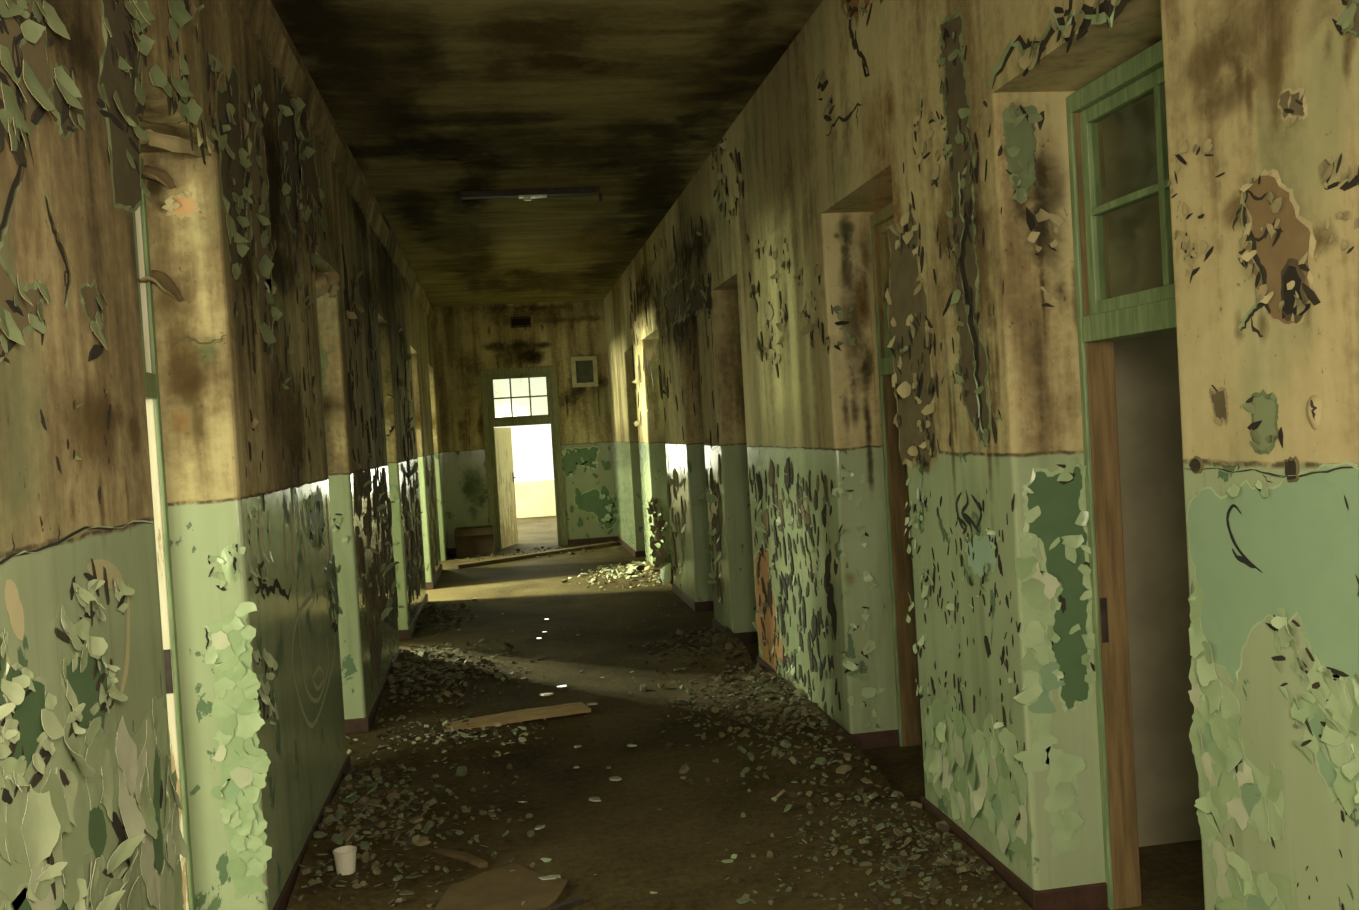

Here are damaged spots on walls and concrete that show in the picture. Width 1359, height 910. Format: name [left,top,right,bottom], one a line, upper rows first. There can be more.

peeling [0,0,438,692]
peeling [205,493,292,899]
leakage [263,119,296,297]
peeling [560,446,617,538]
peeling [626,225,724,604]
leakage [639,232,713,400]
peeling [745,234,856,378]
flaking render [749,457,885,728]
peeling [884,11,1096,864]
peeling [1186,385,1359,910]
peeling [1238,169,1359,329]
peeling [1318,153,1359,191]